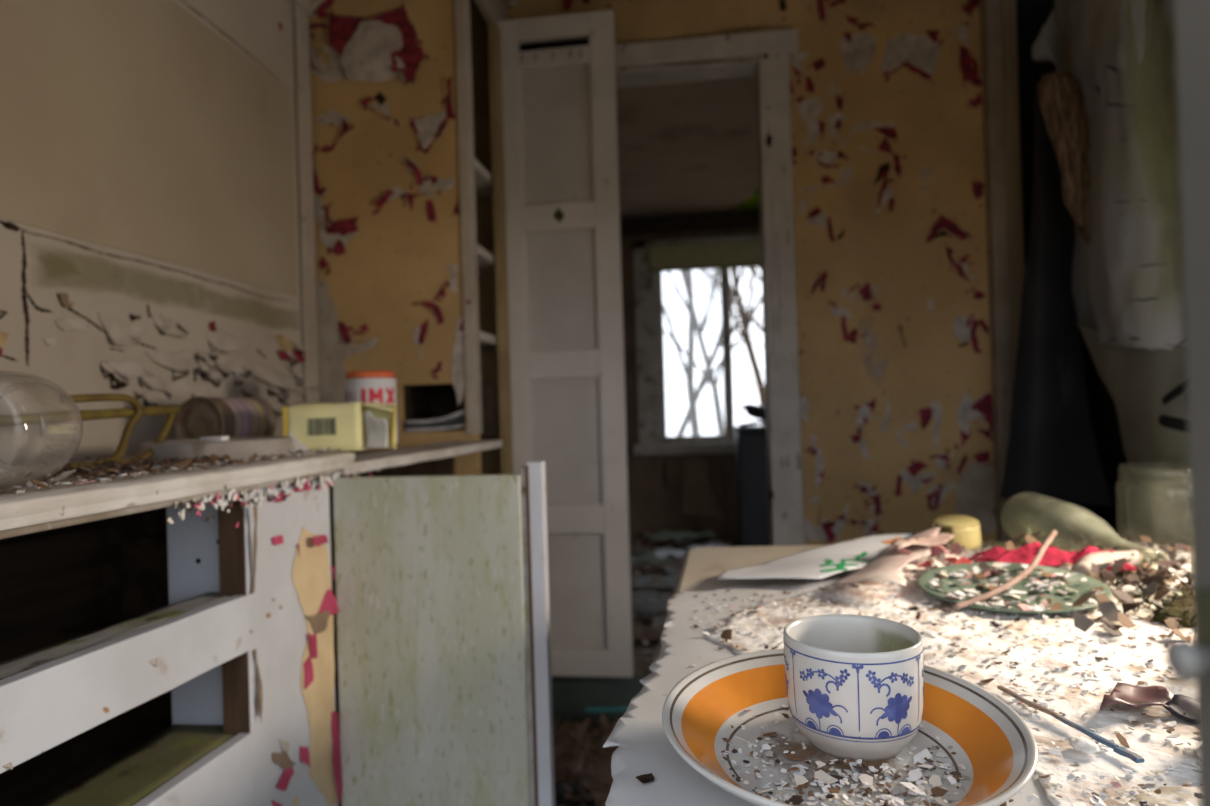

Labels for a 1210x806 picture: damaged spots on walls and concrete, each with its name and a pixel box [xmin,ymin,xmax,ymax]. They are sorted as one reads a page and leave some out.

peeling [960,46,983,109]
peeling [360,77,456,222]
peeling [792,94,848,185]
peeling [874,127,907,212]
crack [0,220,294,366]
peeling [29,118,379,423]
peeling [412,281,449,325]
peeling [811,271,867,344]
peeling [926,209,986,299]
peeling [895,393,996,533]
peeling [821,484,884,544]
peeling [167,465,405,806]